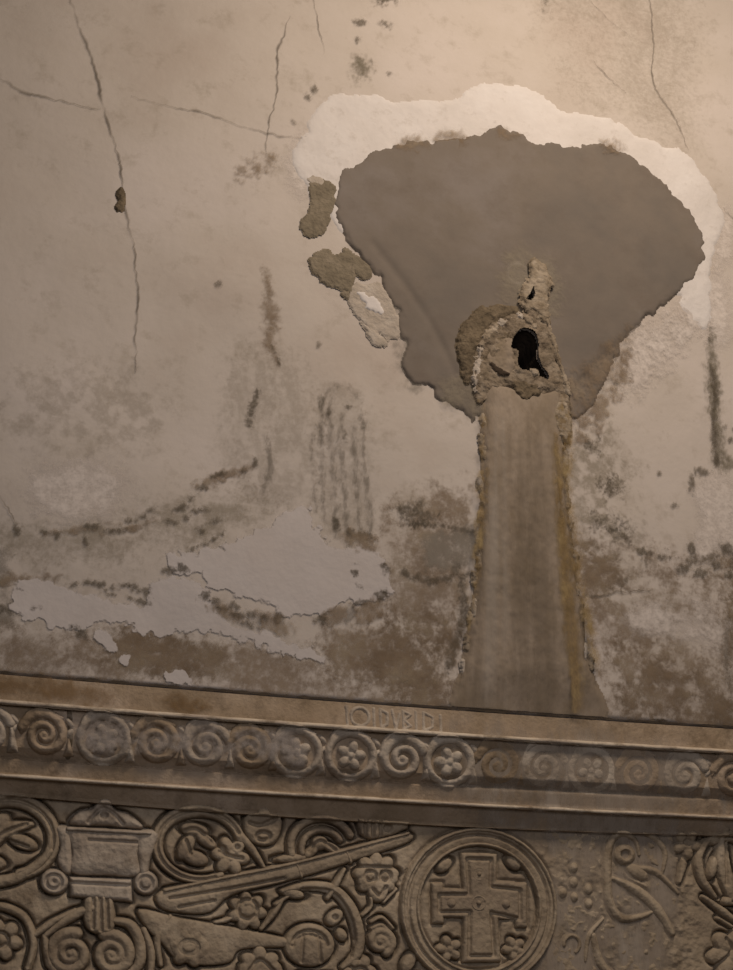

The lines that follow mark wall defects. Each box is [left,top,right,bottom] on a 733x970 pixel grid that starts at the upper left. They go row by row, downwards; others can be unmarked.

crack [87,46,123,180]
peeling [299,175,337,238]
leakage [265,276,278,351]
peeling [308,247,400,348]
spalling [455,257,573,443]
peeling [27,460,122,545]
peeling [172,458,258,524]
peeling [9,505,395,666]
leakage [0,386,733,726]
peeling [164,670,192,686]